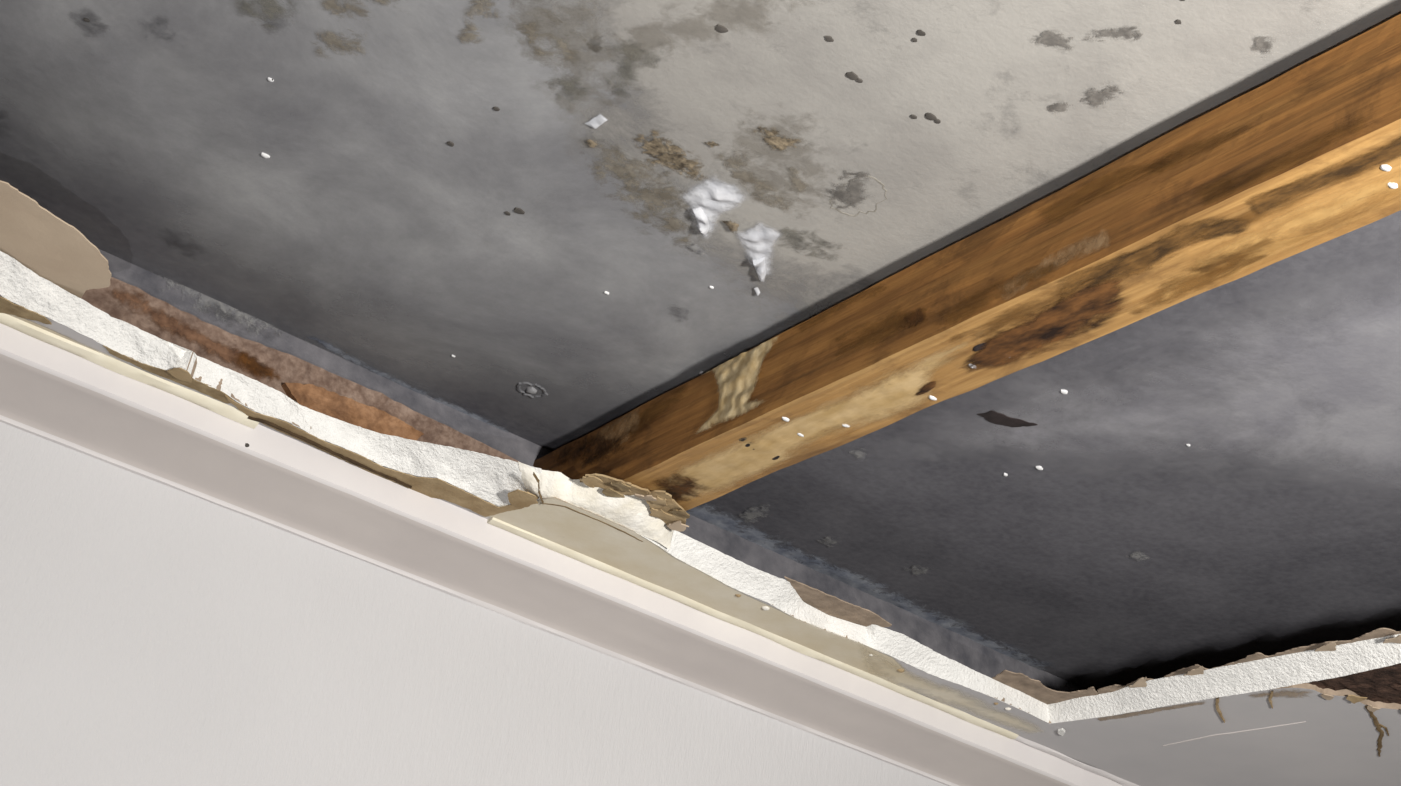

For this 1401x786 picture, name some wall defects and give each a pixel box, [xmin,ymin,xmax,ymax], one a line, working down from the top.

spalling [0,180,542,517]
peeling [0,0,1401,398]
peeling [957,277,1401,486]
spalling [636,530,1099,724]